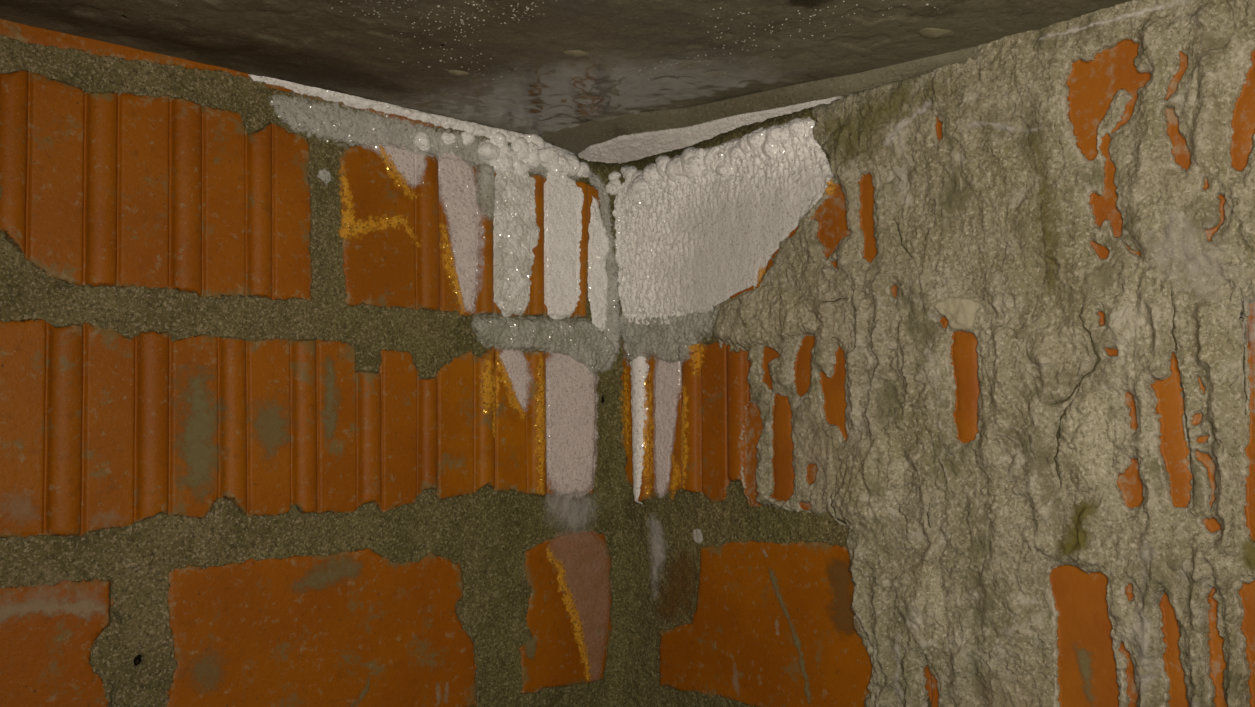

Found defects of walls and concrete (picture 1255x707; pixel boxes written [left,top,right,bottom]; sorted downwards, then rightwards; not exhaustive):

spalling [1061,37,1226,262]
spalling [1224,47,1255,173]
spalling [809,170,877,272]
spalling [740,335,848,513]
spalling [933,314,981,447]
crack [1051,301,1100,486]
spalling [1120,349,1222,538]
crack [1169,287,1177,352]
crack [1180,383,1194,493]
crack [1240,290,1248,415]
spalling [1047,562,1139,707]
spalling [1198,579,1255,707]